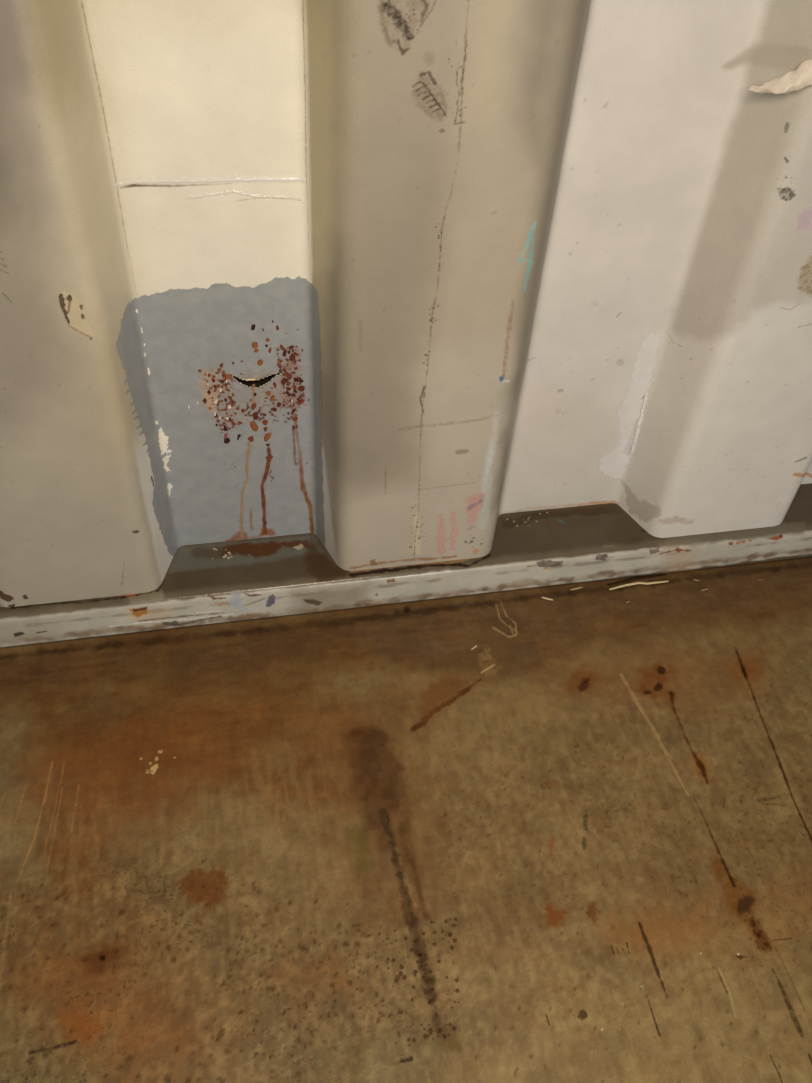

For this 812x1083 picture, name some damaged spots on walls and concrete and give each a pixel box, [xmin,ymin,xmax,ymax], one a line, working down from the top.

rust [198,320,314,559]
peeling [599,333,659,479]